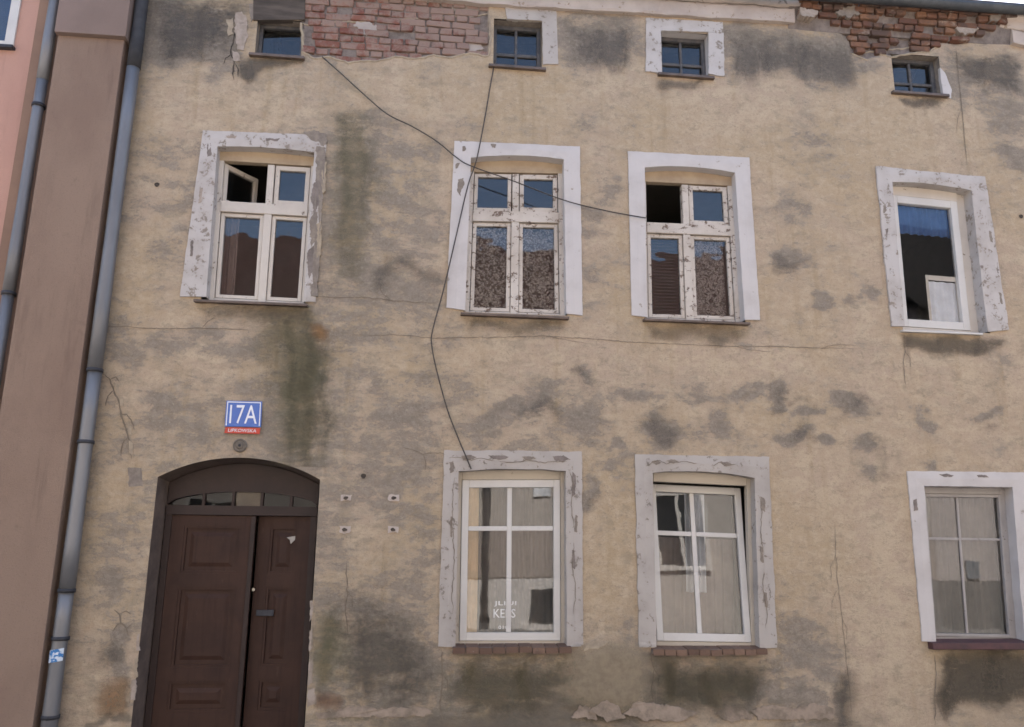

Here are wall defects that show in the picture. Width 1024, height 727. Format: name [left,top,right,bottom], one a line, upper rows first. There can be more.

flaking render [226,3,253,62]
flaking render [300,0,492,64]
flaking render [788,0,1018,61]
flaking render [304,130,328,297]
crack [102,373,135,458]
crack [830,539,852,711]
damp [462,667,559,709]
damp [664,671,757,704]
damp [937,651,1024,711]